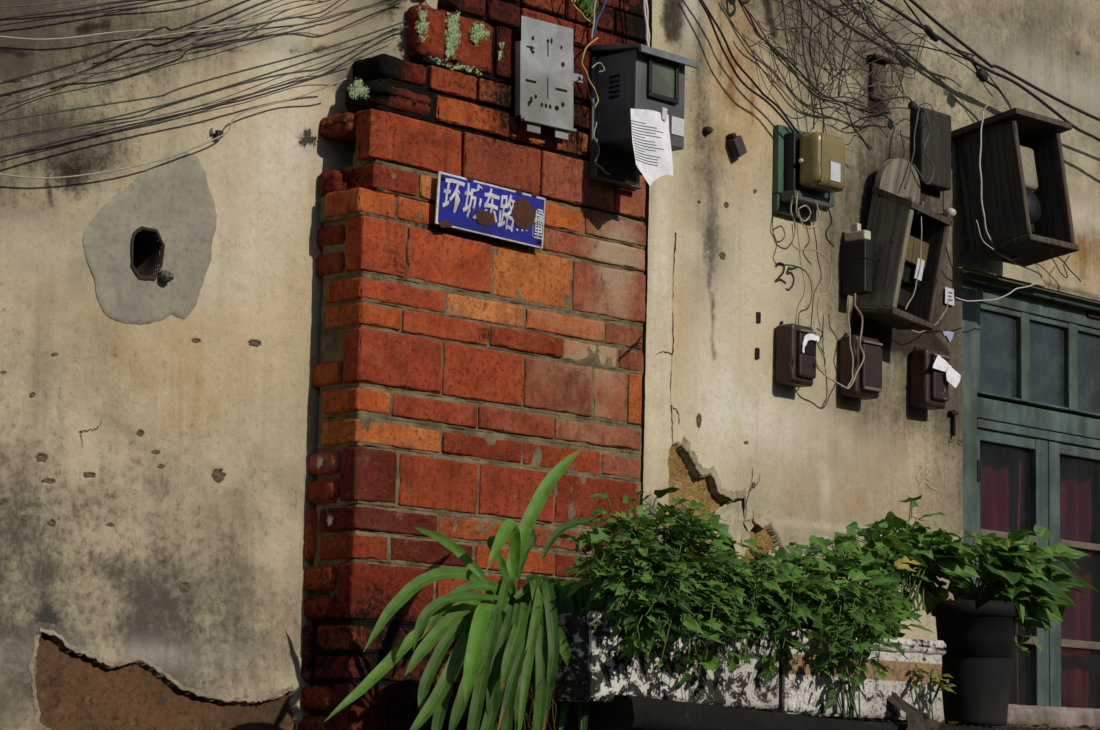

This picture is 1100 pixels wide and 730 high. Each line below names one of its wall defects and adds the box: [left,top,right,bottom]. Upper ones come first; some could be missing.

leakage [77,21,110,33]
leakage [47,158,104,198]
peeling [667,436,779,566]
leakage [38,606,58,625]
peeling [29,627,296,730]